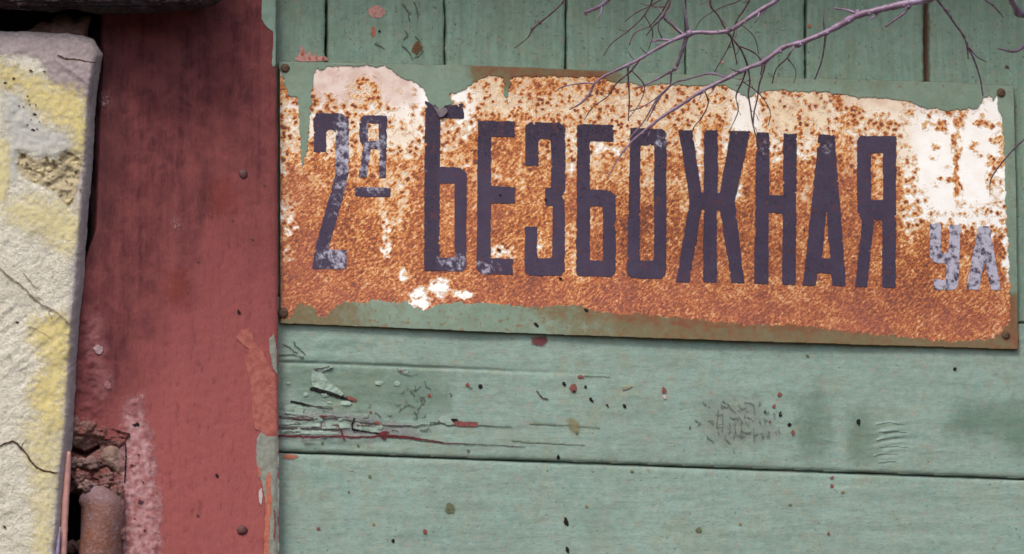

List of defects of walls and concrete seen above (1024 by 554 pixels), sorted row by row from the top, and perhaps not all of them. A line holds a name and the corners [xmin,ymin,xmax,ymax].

rust [532,337,547,346]
crack [0,439,58,474]
peeling [236,329,441,554]